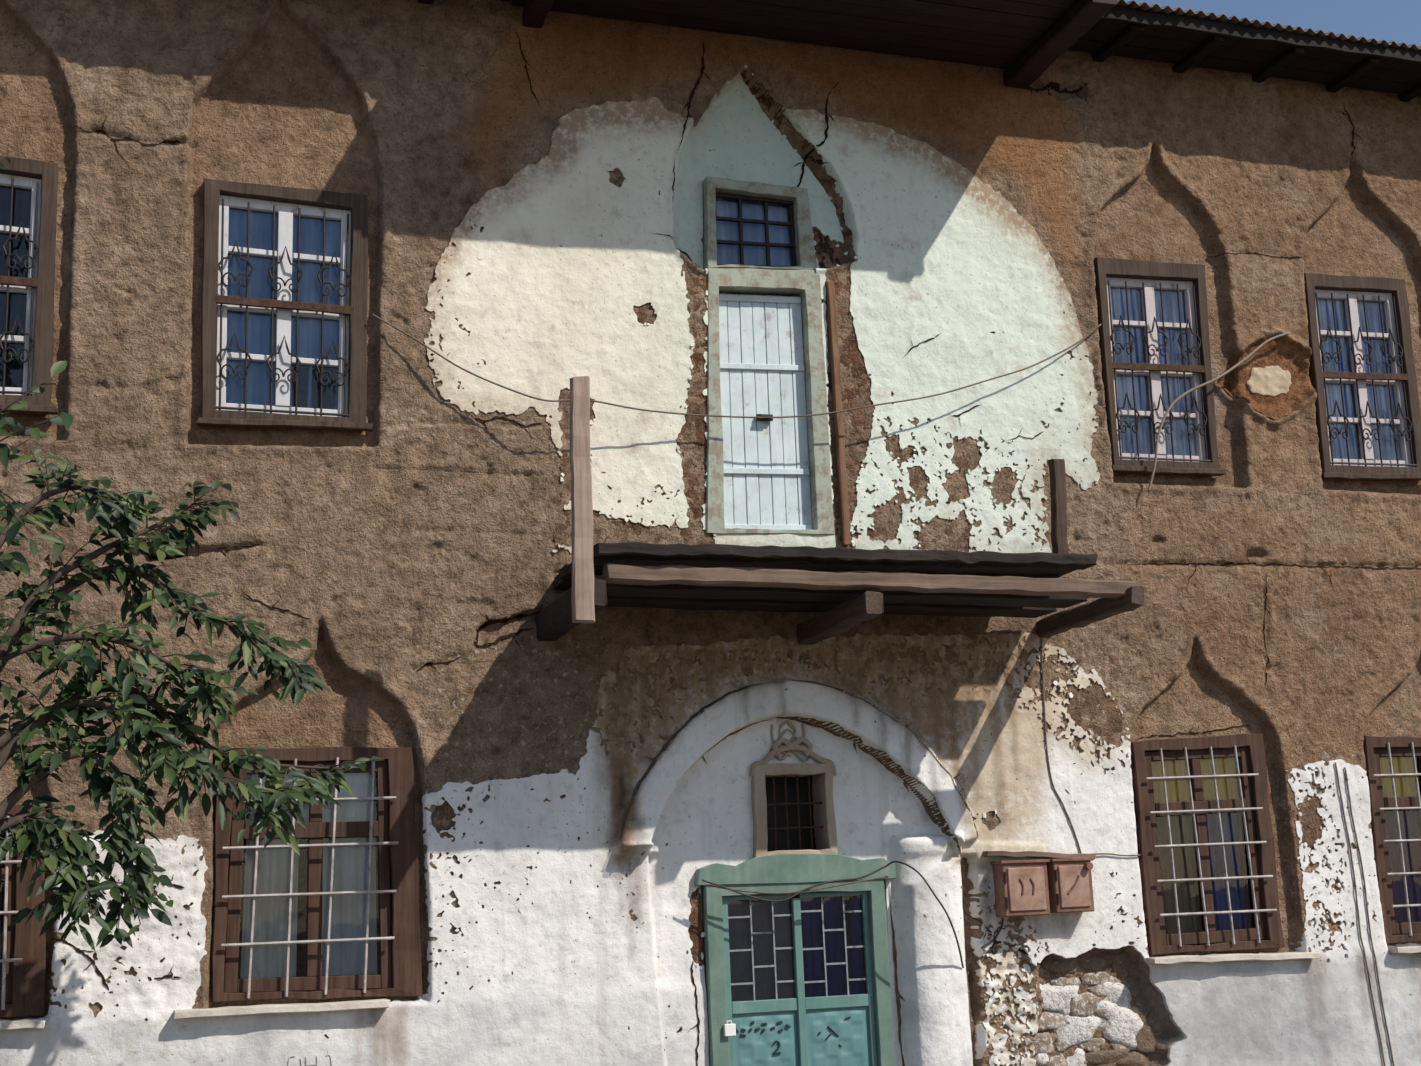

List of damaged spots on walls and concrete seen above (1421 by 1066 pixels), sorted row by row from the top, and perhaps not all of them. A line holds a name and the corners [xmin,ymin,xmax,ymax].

crack [73,119,185,164]
peeling [607,168,627,188]
crack [793,82,839,187]
crack [1339,104,1363,155]
peeling [741,65,1015,552]
peeling [593,257,717,545]
peeling [554,393,571,548]
crack [129,544,260,567]
crack [415,610,541,673]
peeling [1024,657,1125,749]
peeling [1297,794,1325,850]
spalling [973,942,1161,1066]